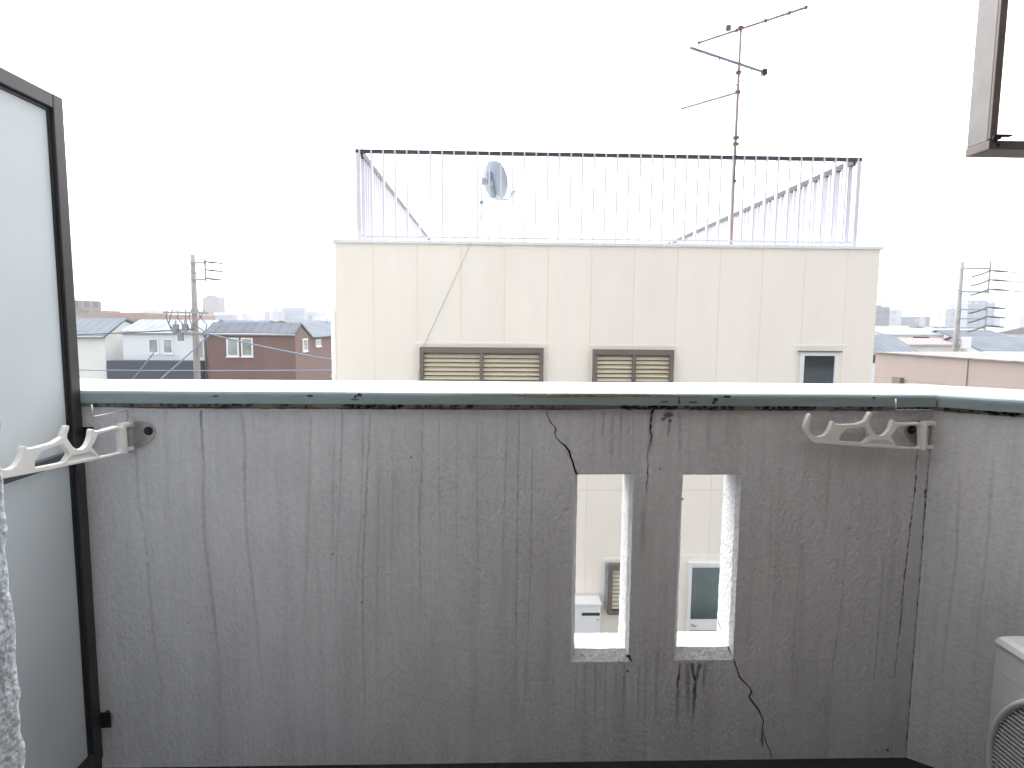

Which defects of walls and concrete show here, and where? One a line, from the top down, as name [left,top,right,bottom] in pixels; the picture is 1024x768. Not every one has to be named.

crack [546,410,578,475]
crack [646,410,654,492]
crack [717,619,772,757]